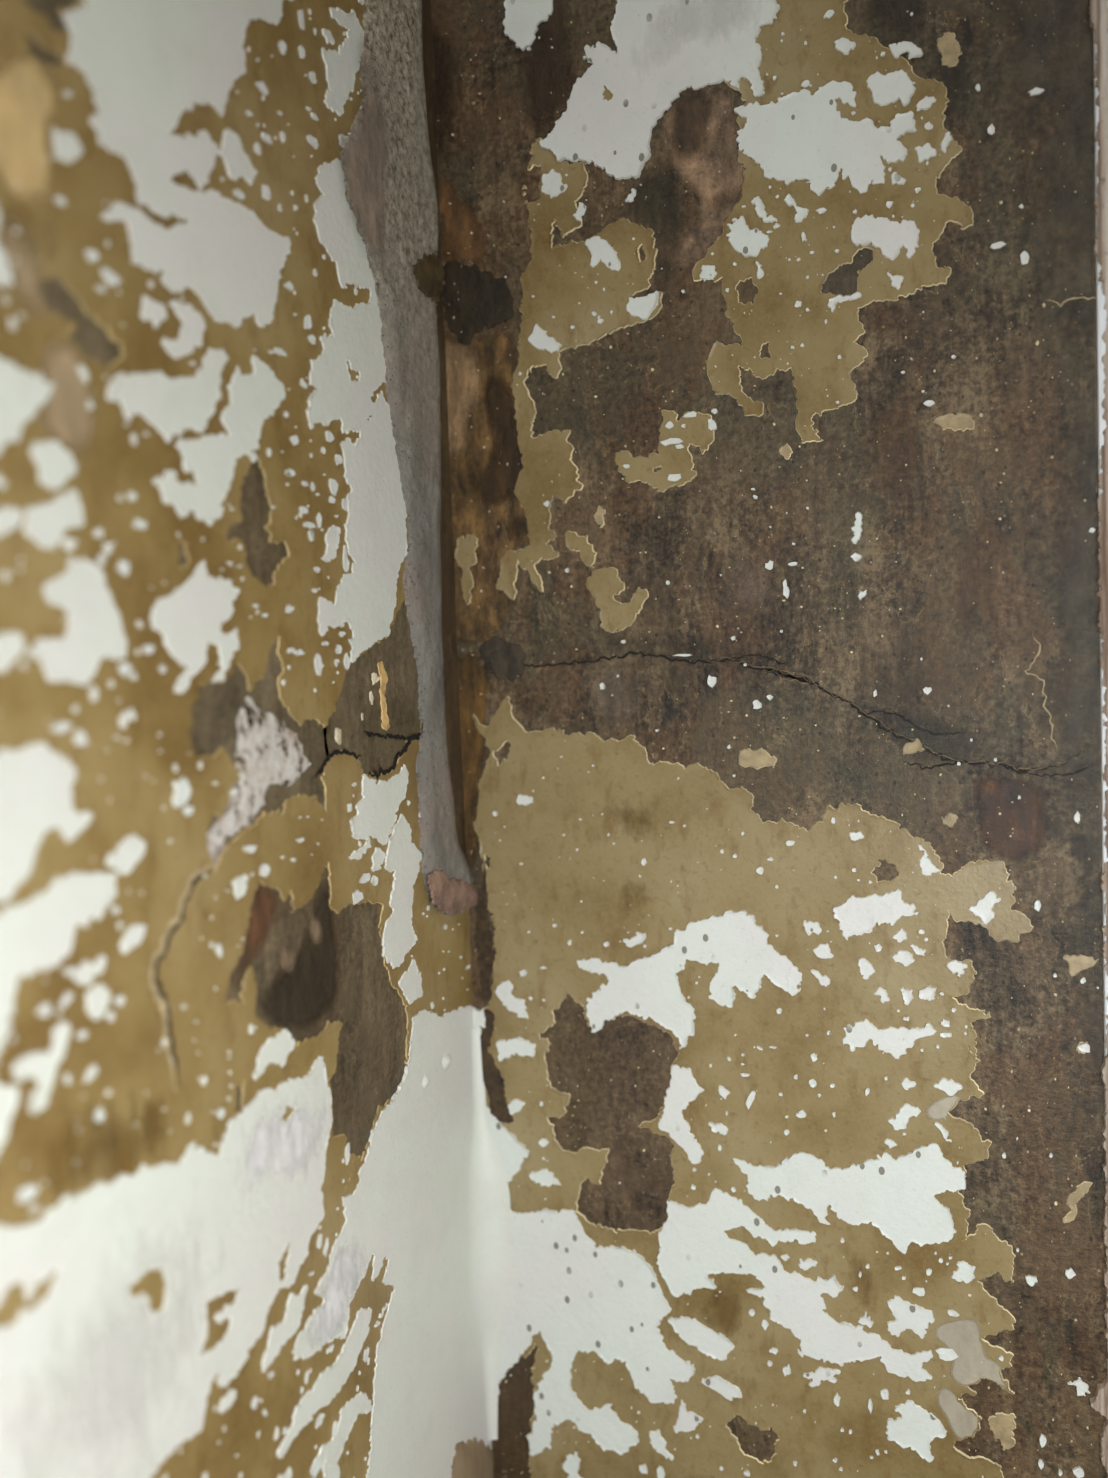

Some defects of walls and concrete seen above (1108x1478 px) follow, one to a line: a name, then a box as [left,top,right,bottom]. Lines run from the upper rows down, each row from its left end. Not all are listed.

water stain [443,261,514,345]
water stain [527,0,571,127]
water stain [630,170,679,232]
water stain [673,92,708,157]
peeling [496,0,974,633]
spalling [1088,0,1108,976]
peeling [0,0,478,1478]
crack [314,721,423,780]
crack [473,651,1098,777]
crack [150,862,216,1092]
peeling [467,696,1034,1478]
spalling [1067,996,1108,1478]